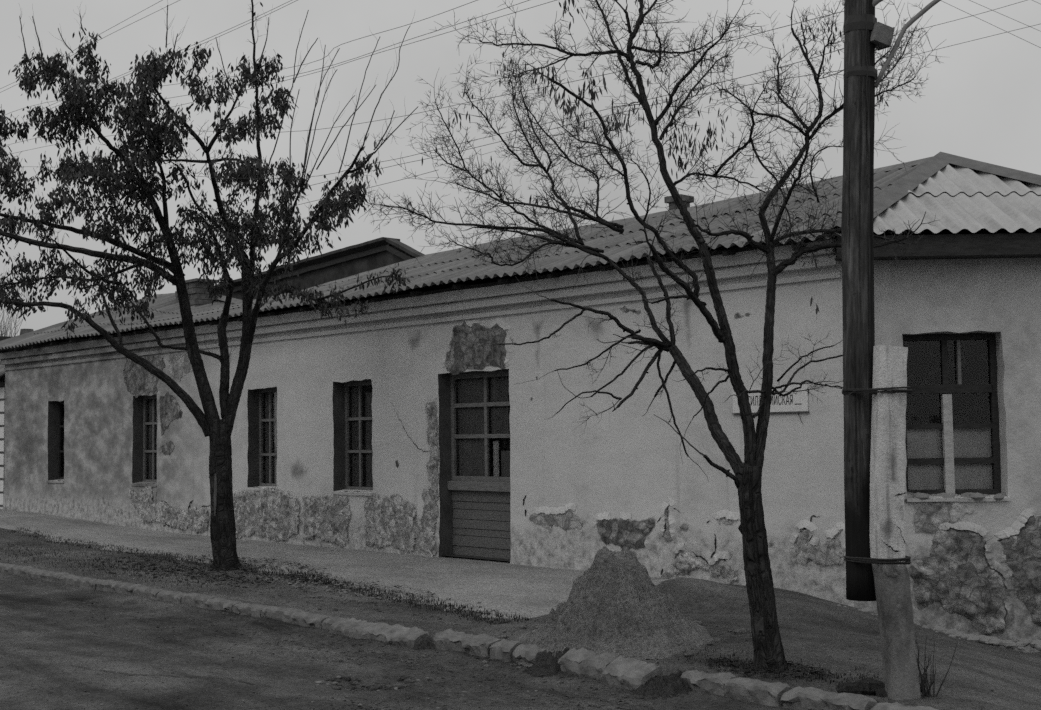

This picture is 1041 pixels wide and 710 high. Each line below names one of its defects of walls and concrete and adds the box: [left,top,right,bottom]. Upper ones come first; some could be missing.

flaking render [441,317,513,375]
flaking render [364,398,440,557]
flaking render [128,486,209,533]
flaking render [233,486,351,547]
flaking render [529,496,740,584]
flaking render [789,520,846,566]
flaking render [909,502,1041,635]